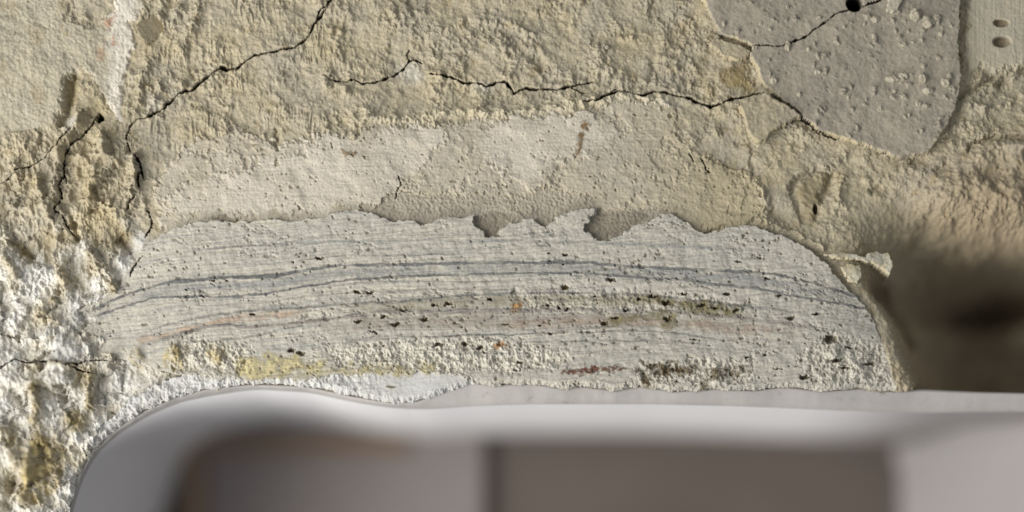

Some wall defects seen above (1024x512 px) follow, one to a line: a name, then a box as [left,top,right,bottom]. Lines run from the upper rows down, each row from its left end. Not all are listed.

crack [758,0,881,47]
crack [324,51,757,109]
crack [126,0,332,276]
crack [800,116,836,141]
crack [6,118,97,237]
flaking render [555,208,645,238]
spalling [819,251,893,284]